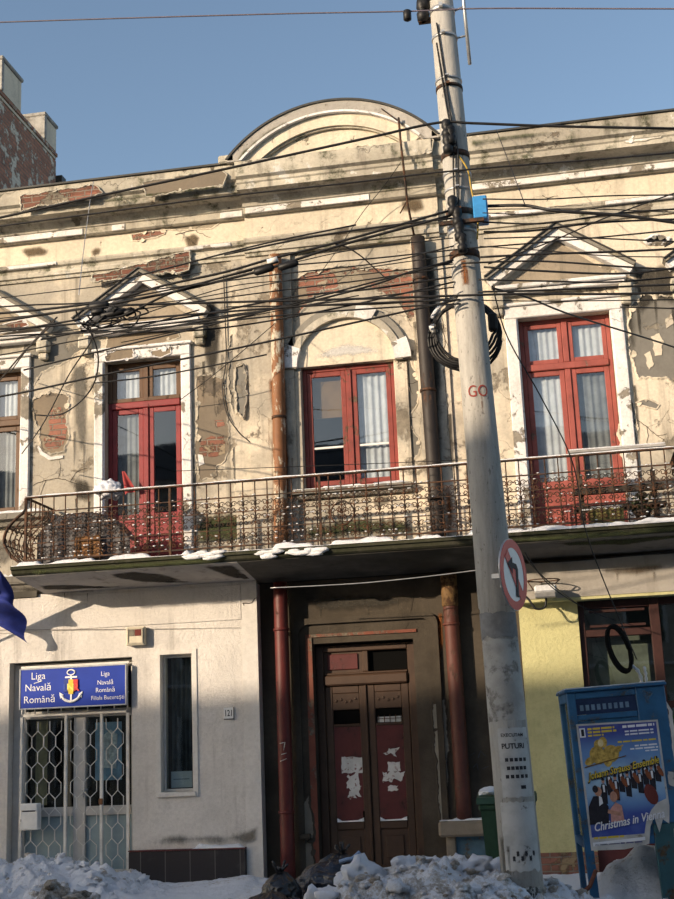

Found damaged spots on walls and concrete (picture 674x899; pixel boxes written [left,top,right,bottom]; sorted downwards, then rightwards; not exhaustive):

flaking render [19,182,103,212]
spalling [131,222,222,242]
flaking render [90,250,192,283]
peeling [291,264,415,323]
peeling [626,294,674,383]
peeling [22,325,84,460]
peeling [191,333,236,499]